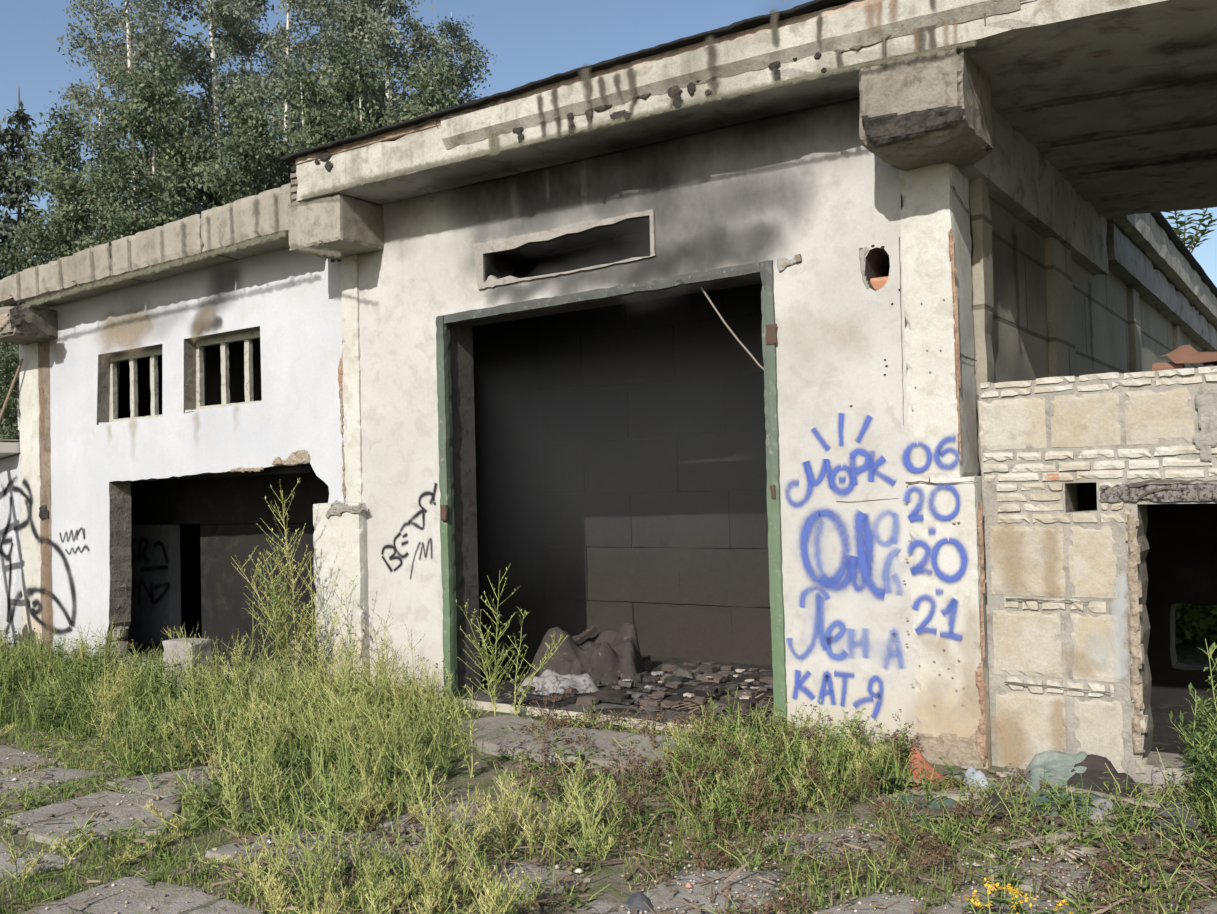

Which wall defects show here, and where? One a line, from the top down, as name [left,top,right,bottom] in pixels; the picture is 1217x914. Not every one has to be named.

spalling [668,80,712,110]
spalling [567,105,632,136]
spalling [862,105,966,146]
leakage [16,194,340,308]
spalling [0,305,25,330]
spalling [230,450,311,473]